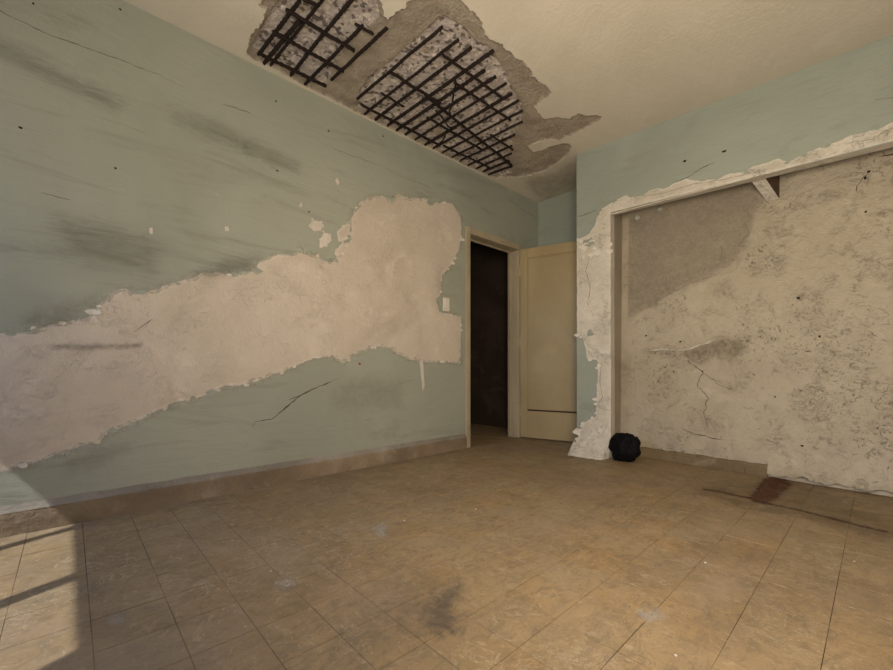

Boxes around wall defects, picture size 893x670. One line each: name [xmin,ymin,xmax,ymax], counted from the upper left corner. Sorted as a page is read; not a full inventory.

crack [0,10,163,77]
spalling [246,0,602,179]
peeling [0,194,465,473]
crack [252,379,335,427]
crack [684,355,732,440]
flaking render [567,122,893,460]